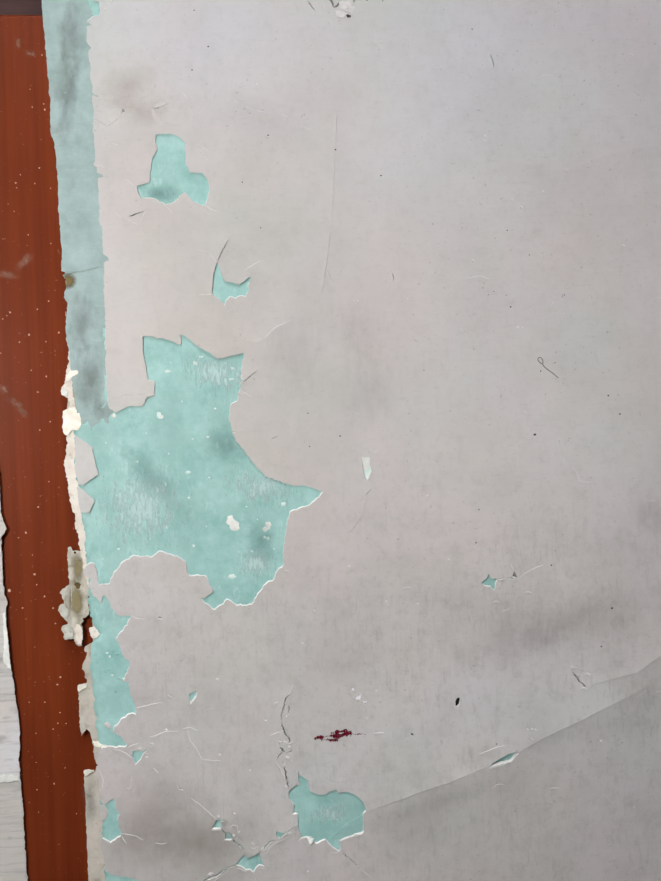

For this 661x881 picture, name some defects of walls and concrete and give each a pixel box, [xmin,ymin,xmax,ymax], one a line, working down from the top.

crack [308,0,353,25]
peeling [42,0,322,765]
crack [264,684,295,790]
peeling [288,771,366,851]
crack [191,826,296,881]